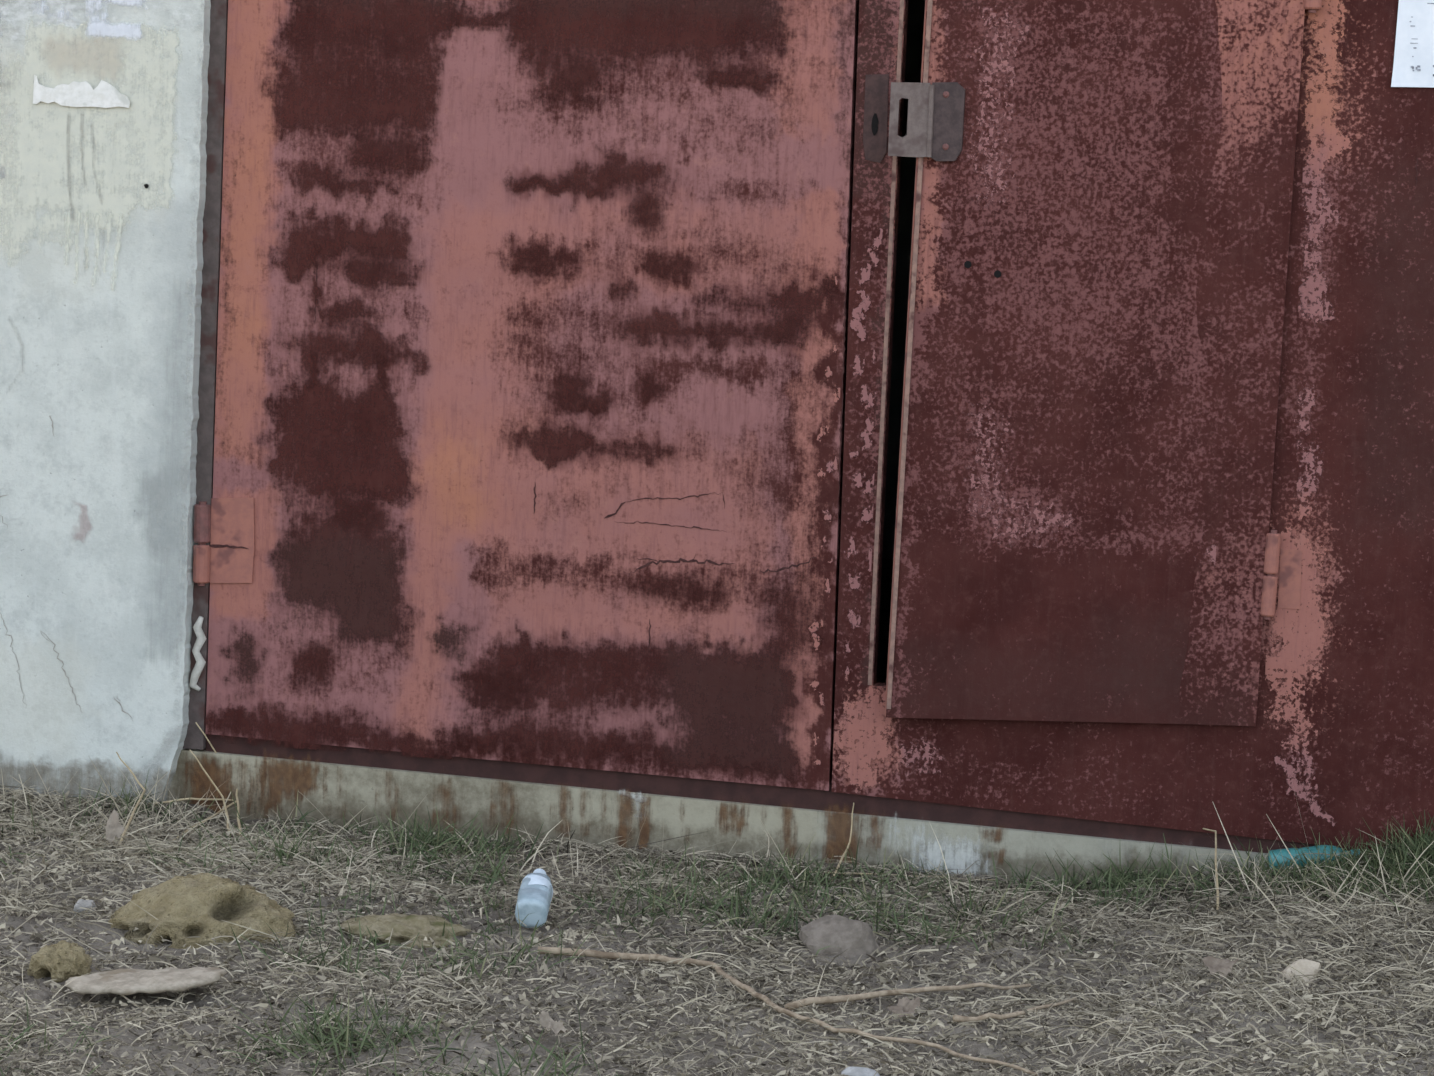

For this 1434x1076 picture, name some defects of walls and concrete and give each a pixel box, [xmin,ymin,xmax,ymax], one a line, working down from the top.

crack [0,613,83,713]
corrosion [185,755,319,815]
corrosion [604,793,651,849]
corrosion [719,803,745,835]
corrosion [784,807,795,860]
corrosion [823,807,882,865]
corrosion [985,828,1004,863]